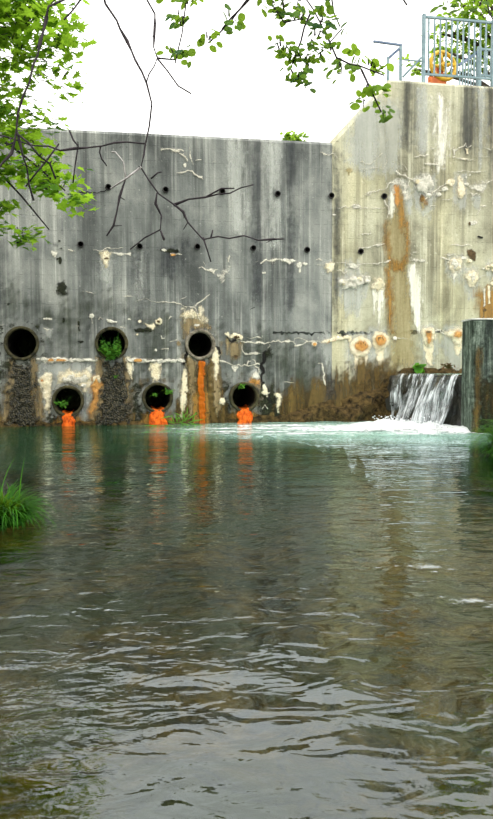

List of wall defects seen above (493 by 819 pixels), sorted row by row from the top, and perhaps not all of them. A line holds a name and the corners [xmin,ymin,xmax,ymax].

corrosion [384,185,415,367]
corrosion [476,284,493,318]
spalling [89,314,171,335]
spalling [182,307,208,334]
leakage [353,357,390,389]
corrosion [192,360,209,424]